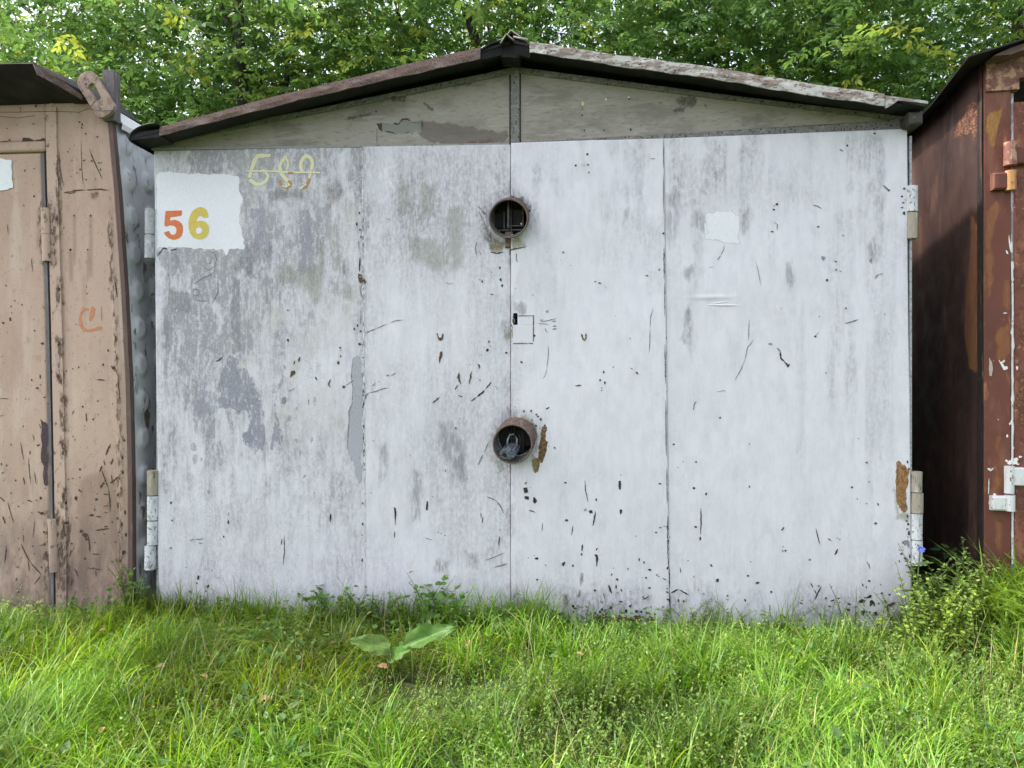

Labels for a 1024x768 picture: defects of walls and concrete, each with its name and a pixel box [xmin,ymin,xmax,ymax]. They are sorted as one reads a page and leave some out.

peeling [376,118,423,135]
corrosion [952,102,1002,146]
peeling [356,188,369,295]
peeling [31,420,48,515]
peeling [194,356,300,453]
peeling [315,317,374,484]
corrosion [530,423,548,473]
corrosion [896,461,910,513]